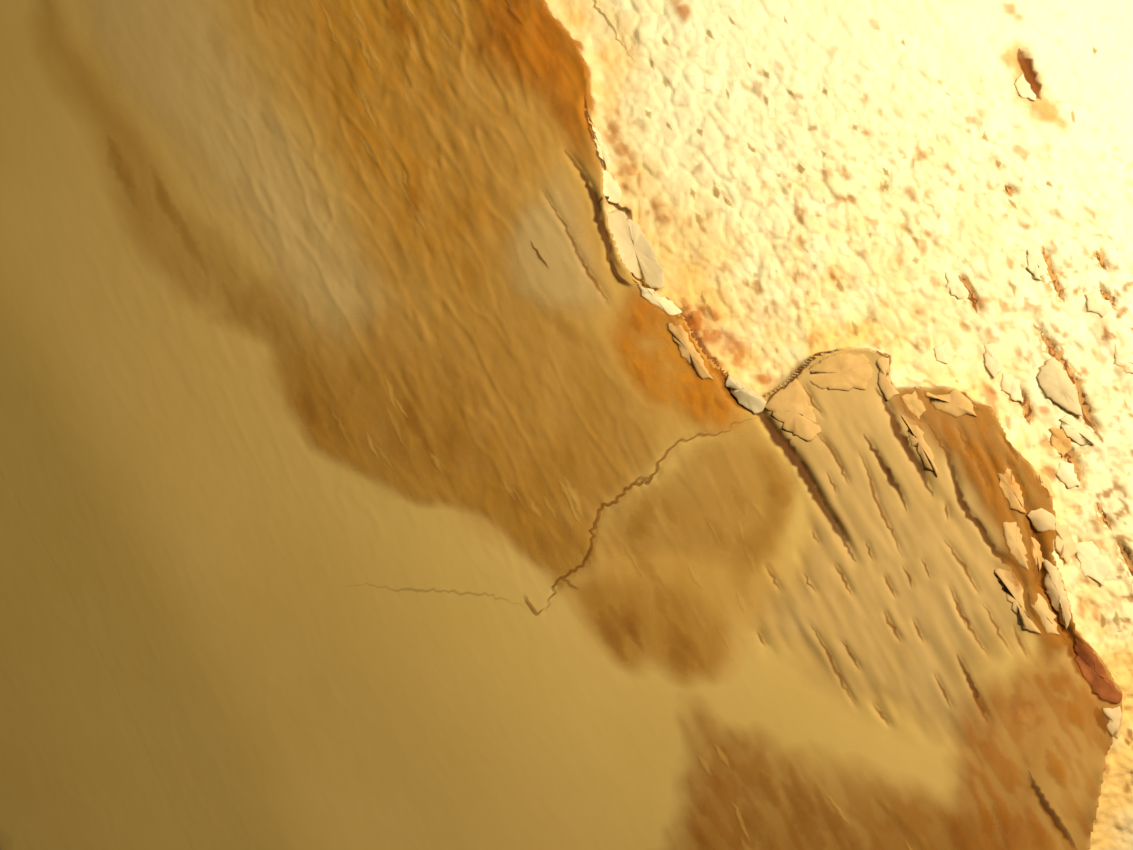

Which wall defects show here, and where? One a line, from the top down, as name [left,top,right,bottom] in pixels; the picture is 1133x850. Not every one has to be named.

damp [100,0,366,314]
damp [258,0,707,574]
crack [527,433,717,615]
damp [615,540,721,673]
flaking render [545,0,1133,850]